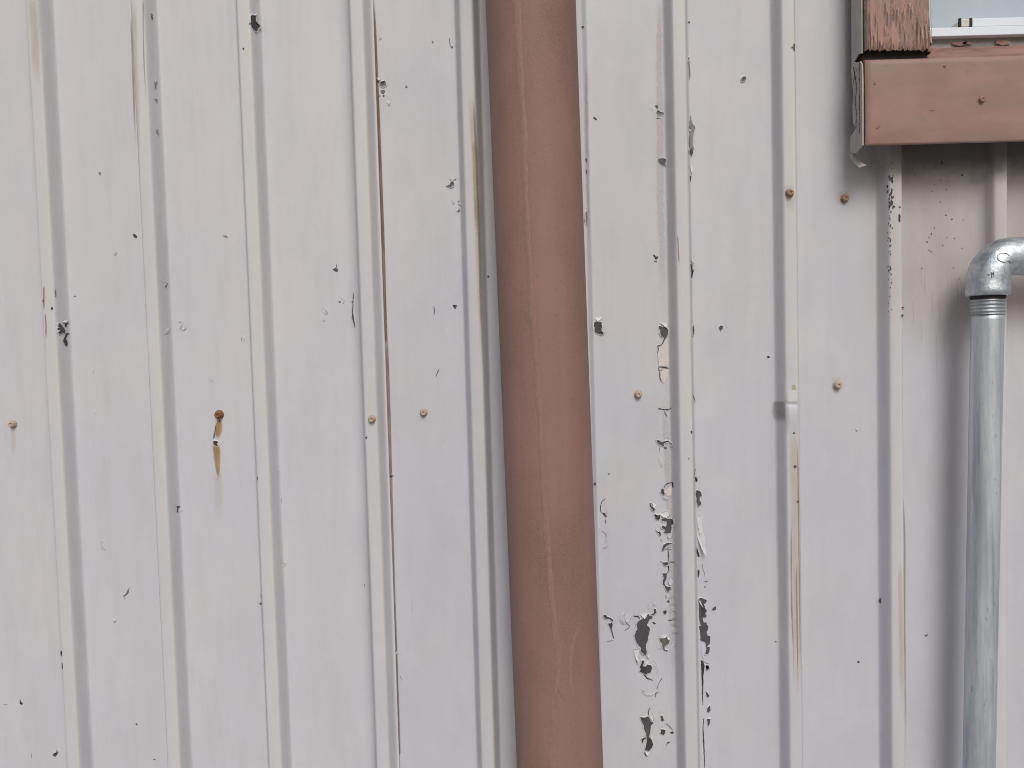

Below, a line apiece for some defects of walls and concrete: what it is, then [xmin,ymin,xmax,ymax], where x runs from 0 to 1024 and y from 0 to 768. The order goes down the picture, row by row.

peeling [249,12,262,33]
peeling [688,115,696,180]
peeling [55,319,69,347]
peeling [593,316,605,336]
peeling [657,322,670,383]
rust [212,419,221,474]
peeling [655,435,674,468]
peeling [649,482,676,552]
peeling [688,458,706,557]
peeling [633,602,678,680]
peeling [697,597,716,671]
peeling [639,708,674,757]